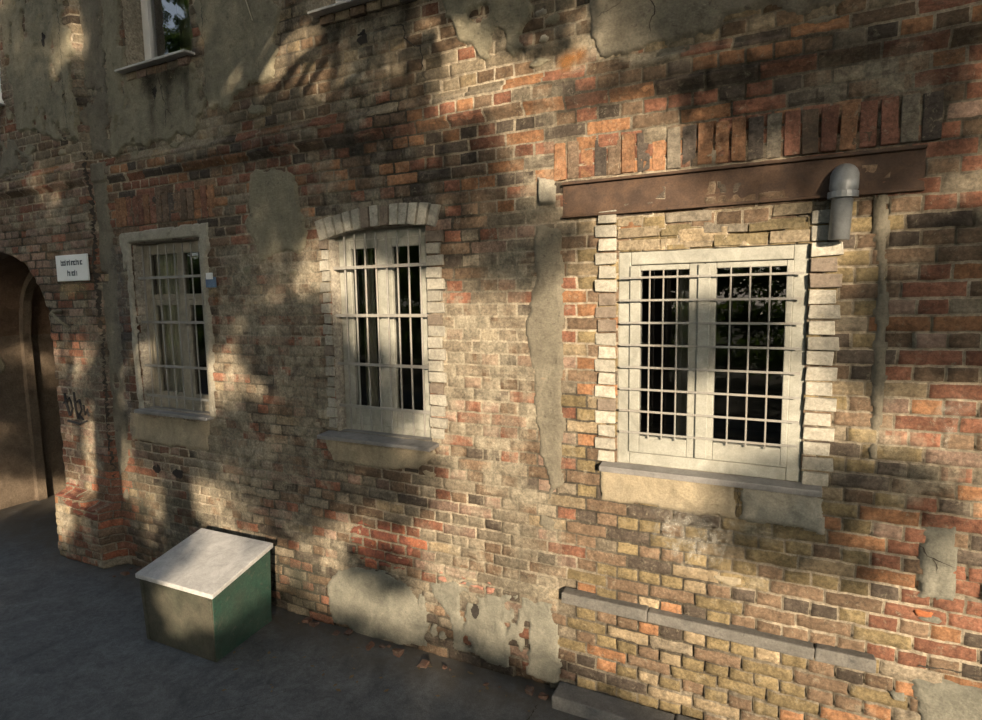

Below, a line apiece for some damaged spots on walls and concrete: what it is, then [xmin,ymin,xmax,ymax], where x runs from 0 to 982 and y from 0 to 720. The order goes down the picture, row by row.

flaking render [443,0,560,61]
flaking render [589,0,847,59]
flaking render [530,57,551,69]
flaking render [0,0,281,479]
spalling [55,482,98,521]
flaking render [327,520,562,685]
flaking render [888,678,982,720]